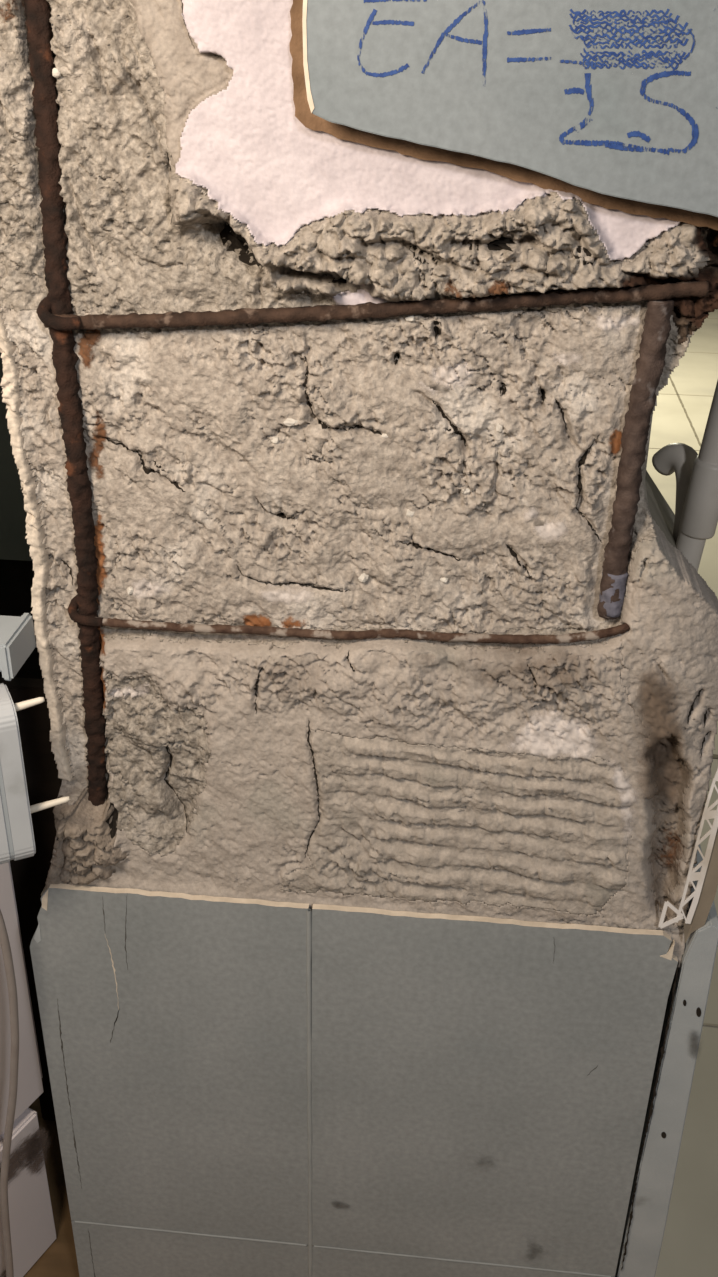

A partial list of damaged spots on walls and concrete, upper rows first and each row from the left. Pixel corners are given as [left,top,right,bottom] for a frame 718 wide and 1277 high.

rust [445,281,509,299]
rust [78,329,101,368]
rust [88,412,106,478]
crack [304,356,382,435]
crack [432,400,466,446]
rust [609,430,622,454]
spalling [0,0,718,960]
rust [94,515,107,604]
crack [237,566,349,592]
rust [243,615,304,628]
crack [305,721,320,857]
crack [102,897,128,1043]